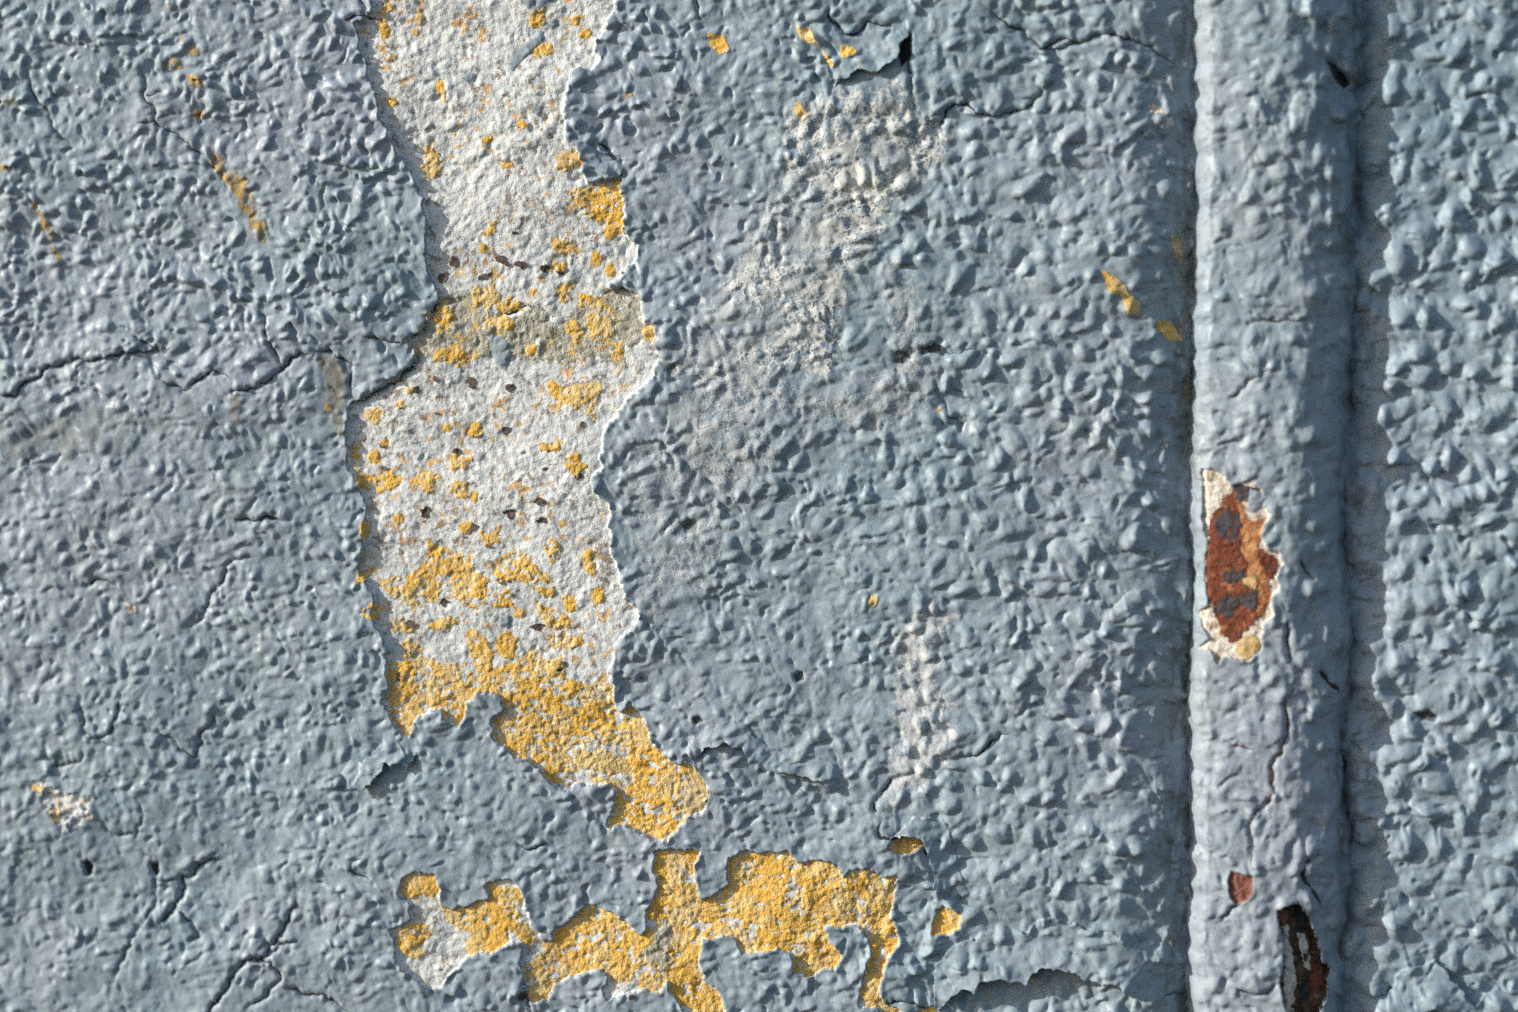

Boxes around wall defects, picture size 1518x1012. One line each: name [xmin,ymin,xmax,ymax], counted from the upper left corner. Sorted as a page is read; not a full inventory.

crack [827,2,1179,125]
crack [1,298,447,405]
peeling [336,0,1159,1012]
corrosion [1198,469,1284,663]
crack [1225,618,1339,866]
peeling [27,777,93,834]
crack [100,802,225,984]
crack [1300,859,1321,905]
crack [209,899,348,1012]
corrosion [1277,904,1330,1012]
peeling [1388,960,1518,1012]